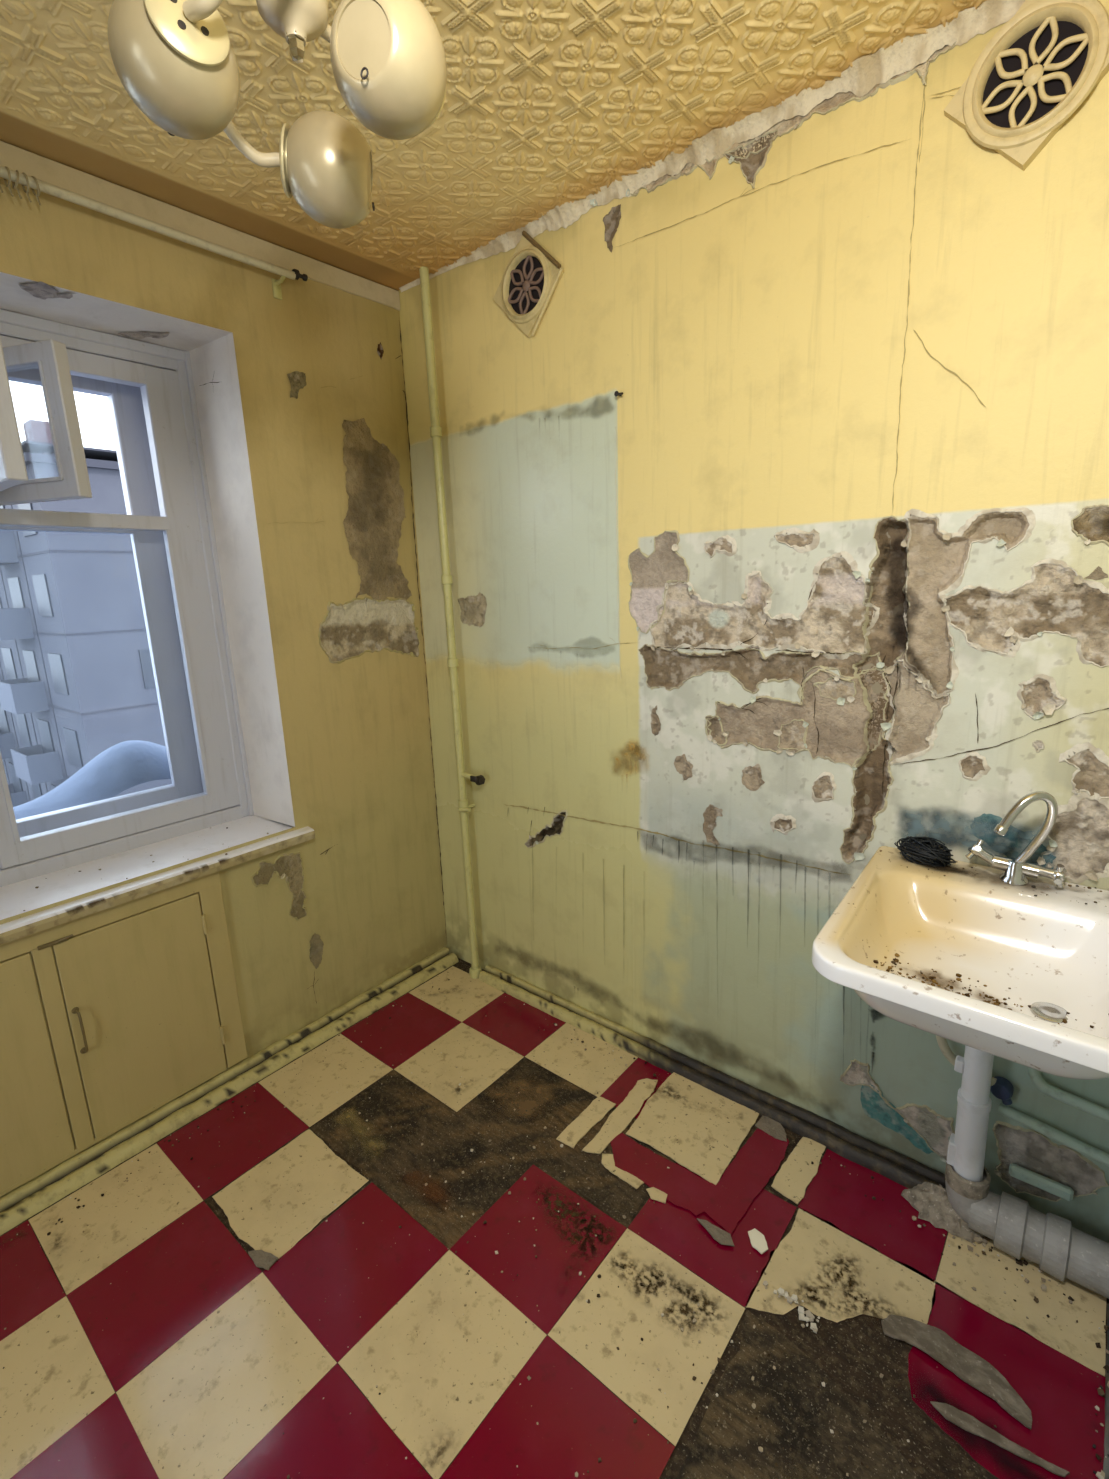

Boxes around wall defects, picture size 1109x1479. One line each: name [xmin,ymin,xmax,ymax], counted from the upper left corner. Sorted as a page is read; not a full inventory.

spalling [590,42,956,252]
crack [623,59,985,513]
peeling [318,418,420,664]
crack [541,620,842,754]
spalling [628,504,1109,884]
crack [882,655,1109,797]
spalling [525,810,568,848]
peeling [310,1058,674,1250]
peeling [763,1128,809,1209]
spalling [840,1059,955,1162]
spalling [992,1121,1109,1202]
peeling [676,1310,920,1479]